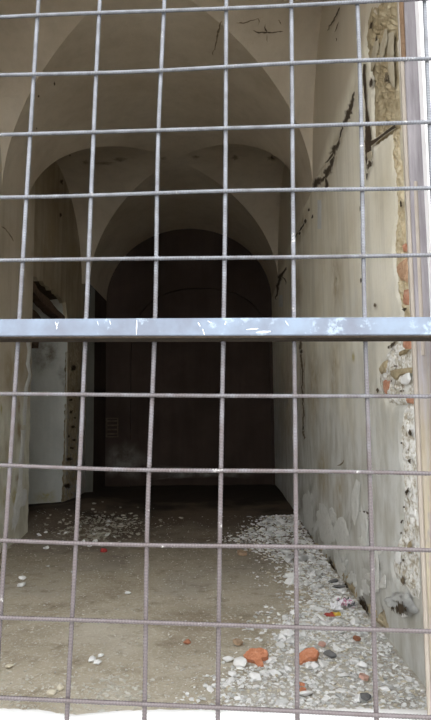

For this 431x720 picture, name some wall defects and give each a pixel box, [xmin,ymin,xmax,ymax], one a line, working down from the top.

crack [212,18,283,55]
crack [327,7,340,41]
crack [311,64,396,188]
spalling [367,2,410,317]
spalling [376,341,421,599]
peeling [298,479,408,628]